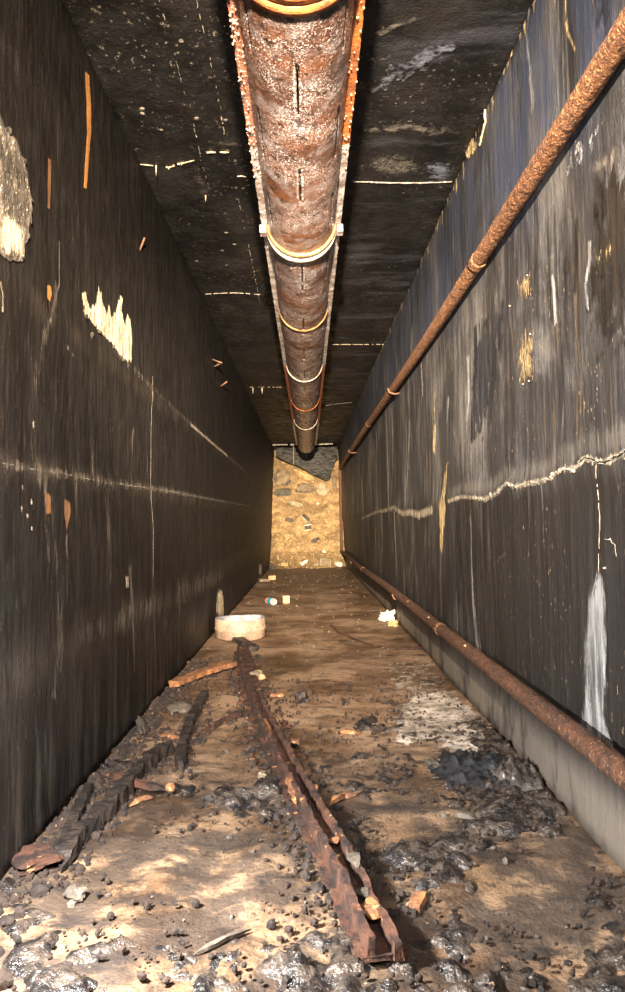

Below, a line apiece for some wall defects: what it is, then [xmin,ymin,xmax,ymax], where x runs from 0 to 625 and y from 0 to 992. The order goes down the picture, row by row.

flaking render [0,115,34,262]
spalling [82,286,132,362]
crack [595,472,616,572]
leakage [582,576,613,748]